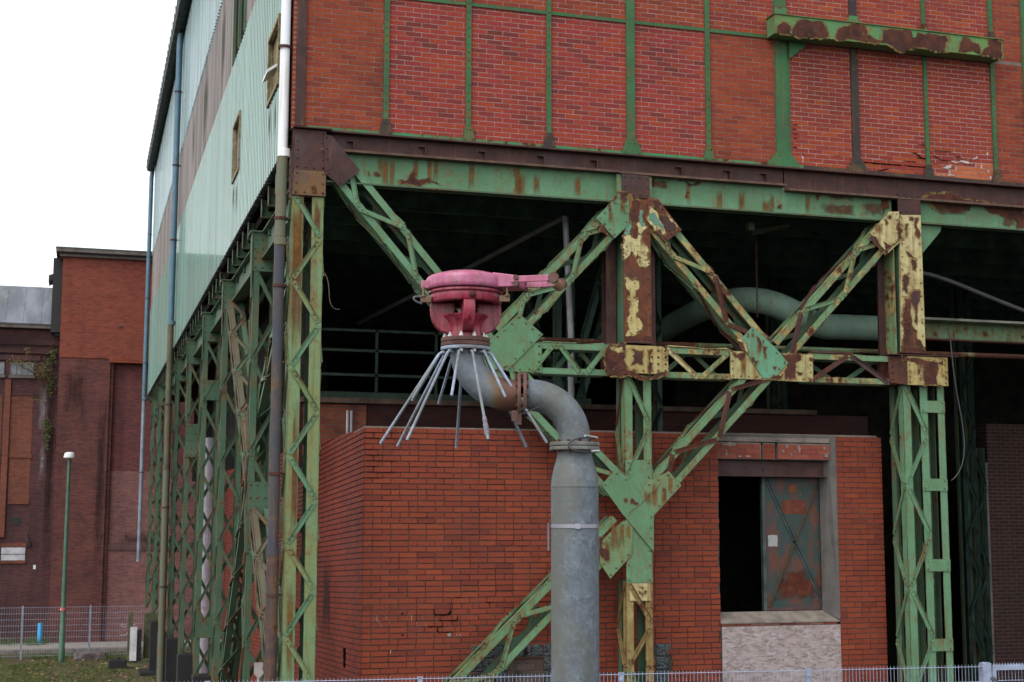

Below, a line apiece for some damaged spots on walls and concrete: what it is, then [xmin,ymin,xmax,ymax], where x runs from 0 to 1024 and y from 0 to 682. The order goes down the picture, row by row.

corrosion [775,18,1004,60]
corrosion [367,161,441,187]
corrosion [516,169,539,193]
crack [864,149,974,171]
corrosion [921,191,1024,229]
peeling [603,194,679,382]
corrosion [729,333,767,374]
corrosion [769,353,813,381]
corrosion [599,479,672,562]
corrosion [778,571,820,598]